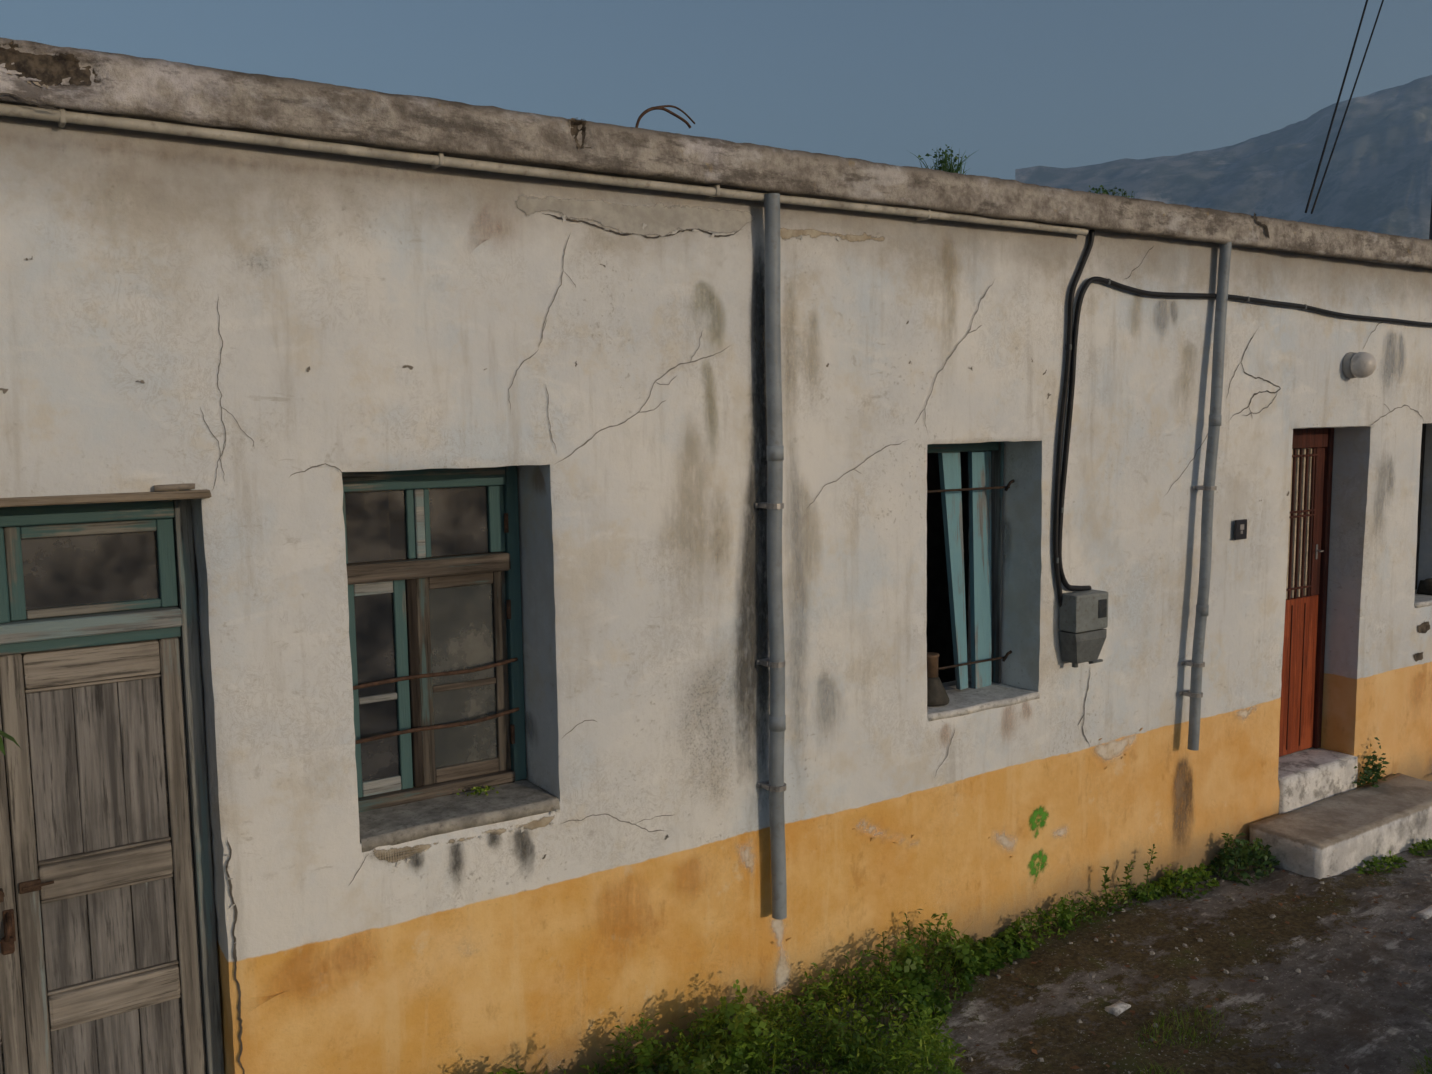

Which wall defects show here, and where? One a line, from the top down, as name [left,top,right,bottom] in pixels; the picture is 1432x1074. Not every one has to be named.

spalling [0,40,101,89]
crack [200,298,254,489]
crack [290,463,349,476]
crack [508,235,728,463]
damp [737,258,770,730]
crack [808,279,995,507]
crack [1165,332,1281,495]
damp [381,853,422,868]
damp [452,844,461,873]
damp [515,831,533,860]
crack [225,840,245,1074]